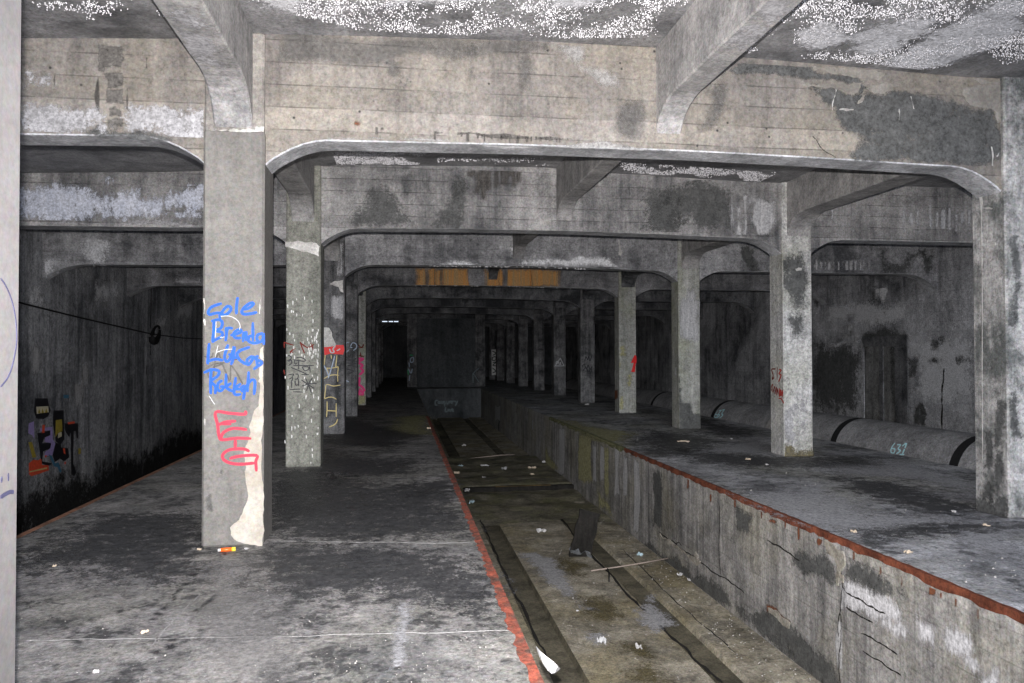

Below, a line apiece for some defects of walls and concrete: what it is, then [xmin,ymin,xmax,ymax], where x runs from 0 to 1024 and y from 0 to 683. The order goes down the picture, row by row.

damp [247,0,306,14]
damp [545,0,604,10]
damp [794,0,1024,70]
damp [21,45,204,141]
damp [730,63,1001,166]
damp [349,184,411,228]
damp [431,170,520,229]
peeling [230,346,264,546]
crack [838,573,901,683]